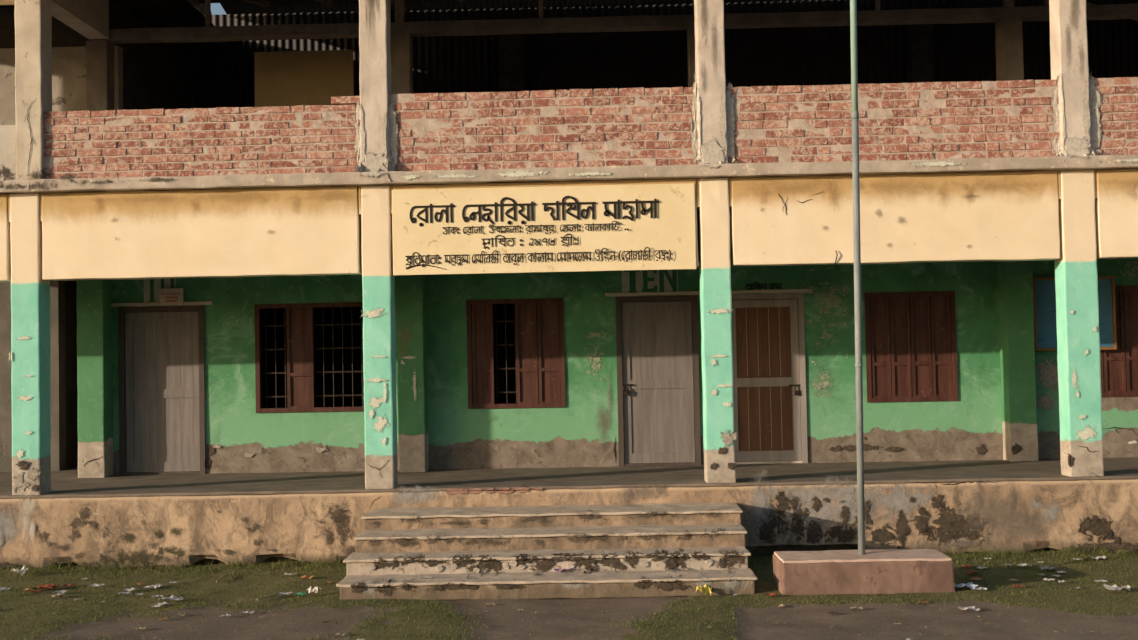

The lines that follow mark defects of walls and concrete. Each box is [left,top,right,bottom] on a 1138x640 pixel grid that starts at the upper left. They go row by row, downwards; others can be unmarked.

mould [0,166,113,190]
peeling [361,308,385,318]
peeling [401,356,417,400]
peeling [363,378,389,446]
leakage [22,498,185,566]